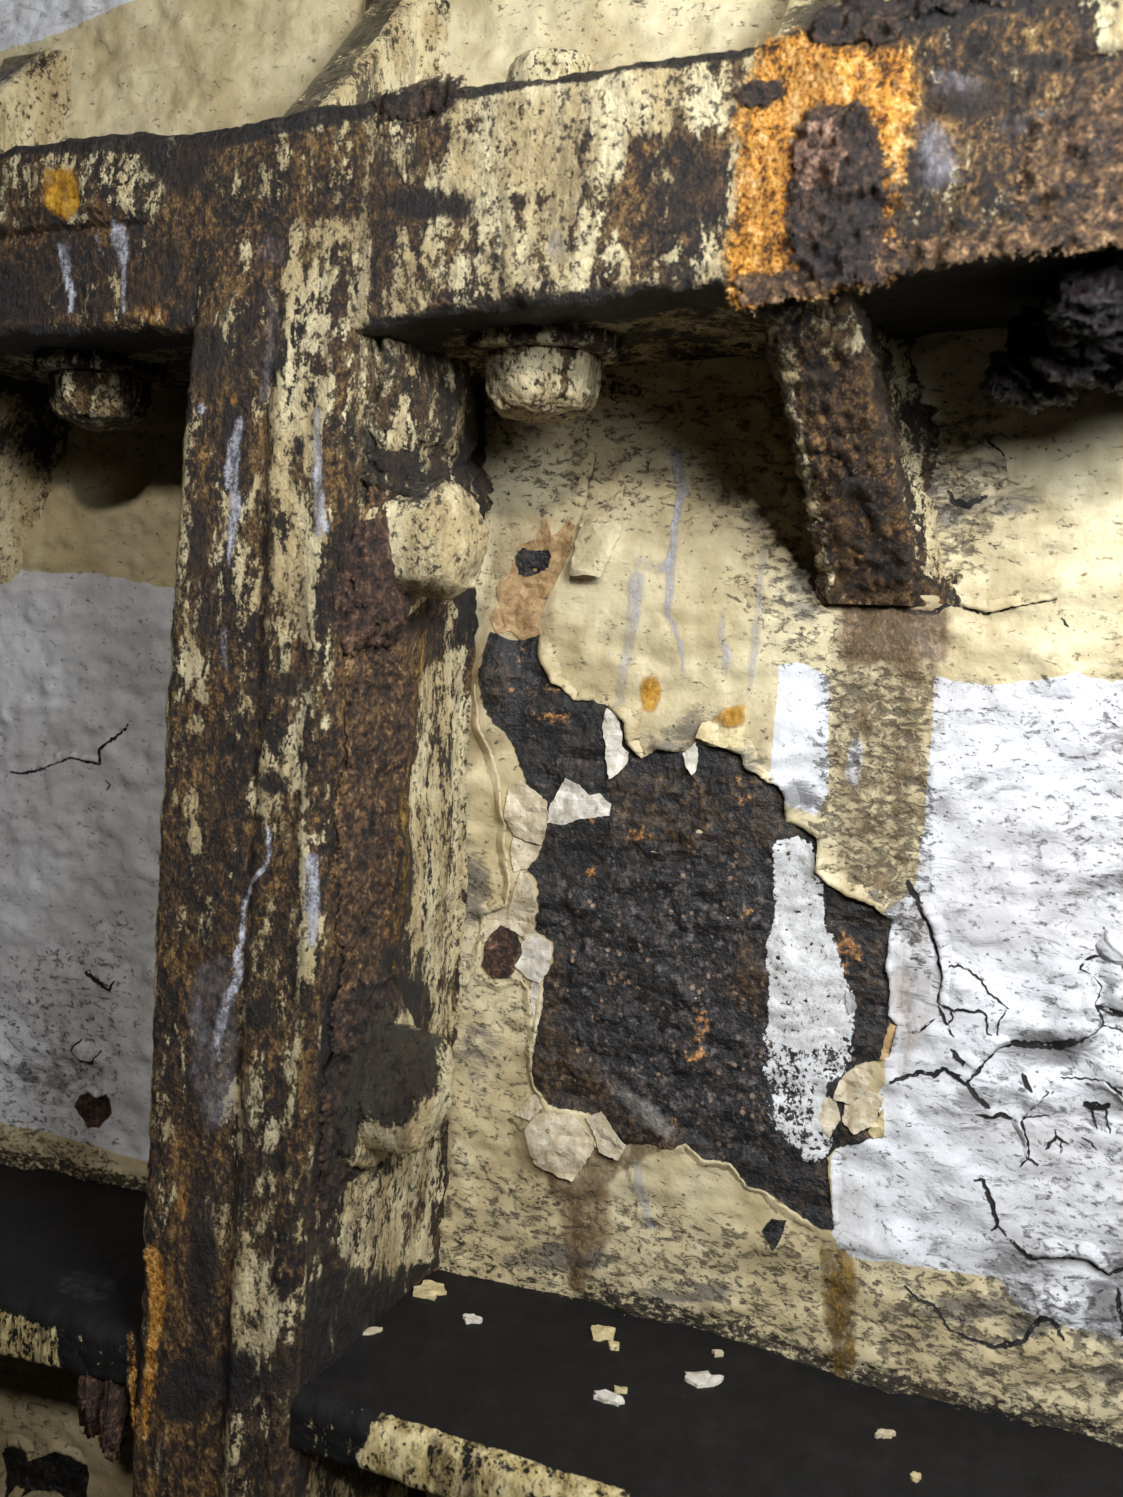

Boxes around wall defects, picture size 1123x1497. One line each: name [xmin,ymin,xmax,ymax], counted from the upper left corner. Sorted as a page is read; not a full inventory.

rust [721,0,1123,313]
rust [361,473,389,520]
crack [10,724,129,790]
peeling [459,447,909,1251]
rust [315,600,427,1215]
crack [84,971,115,993]
crack [889,880,1123,1167]
crack [974,1178,1123,1337]
crack [904,1285,1065,1349]
peeling [593,1385,628,1407]
peeling [0,1434,89,1497]
peeling [875,1429,896,1439]